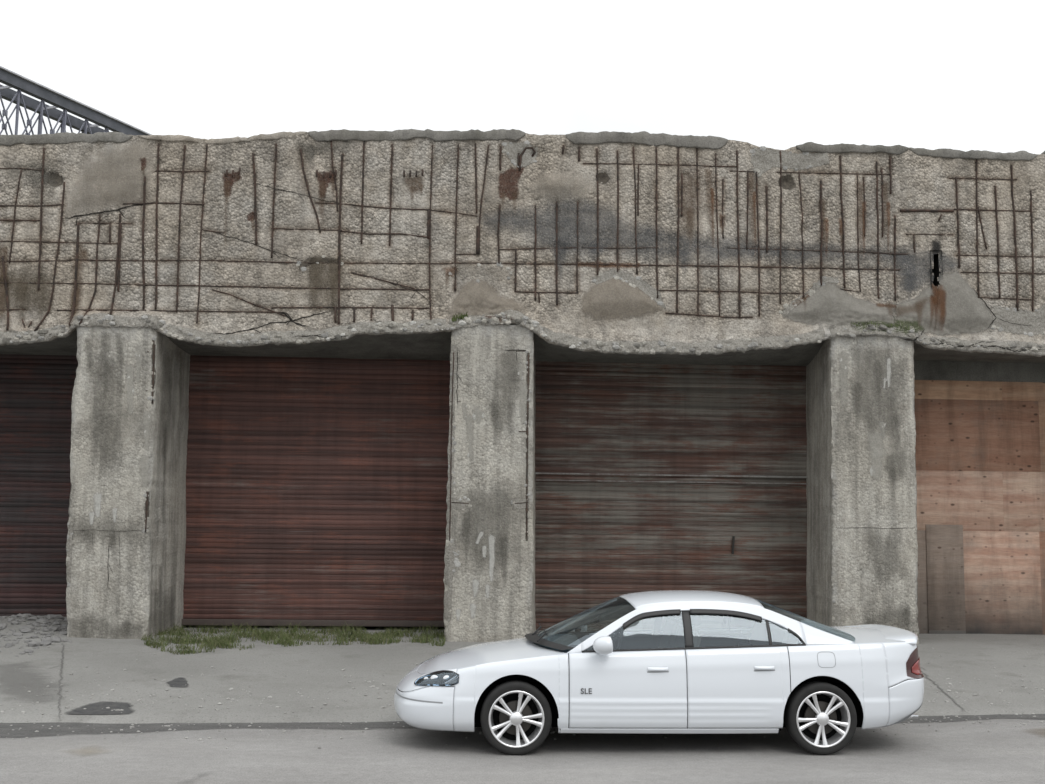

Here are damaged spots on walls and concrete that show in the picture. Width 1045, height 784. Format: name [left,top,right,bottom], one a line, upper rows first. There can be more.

rust [223,172,241,196]
rust [317,172,336,207]
rust [499,167,523,199]
crack [205,311,346,340]
spalling [0,140,1045,626]